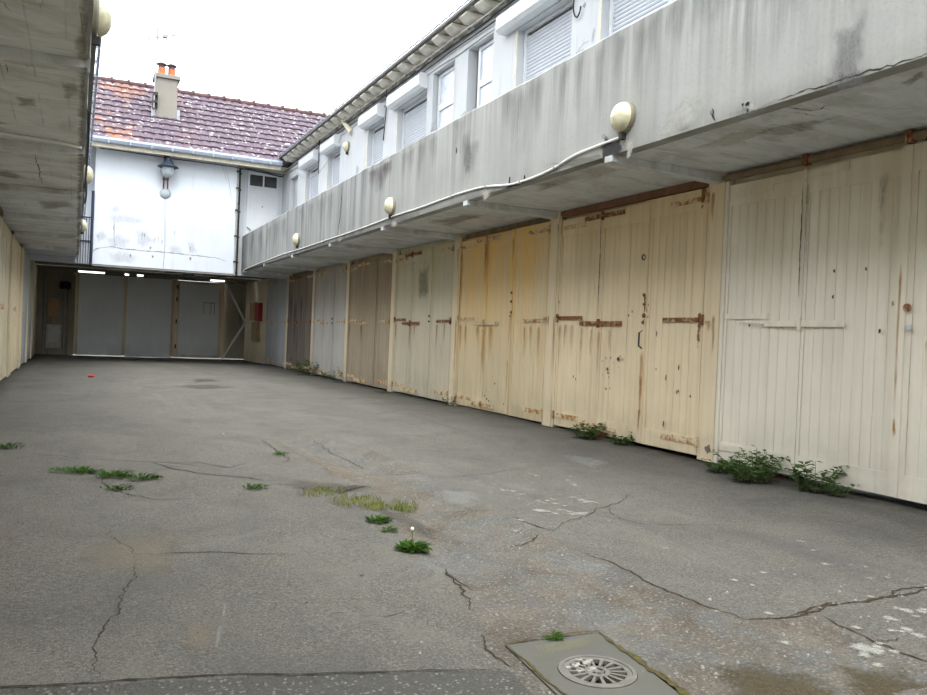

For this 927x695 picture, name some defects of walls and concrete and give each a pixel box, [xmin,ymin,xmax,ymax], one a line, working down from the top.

crack [36,439,290,499]
crack [92,532,295,678]
crack [586,553,927,661]